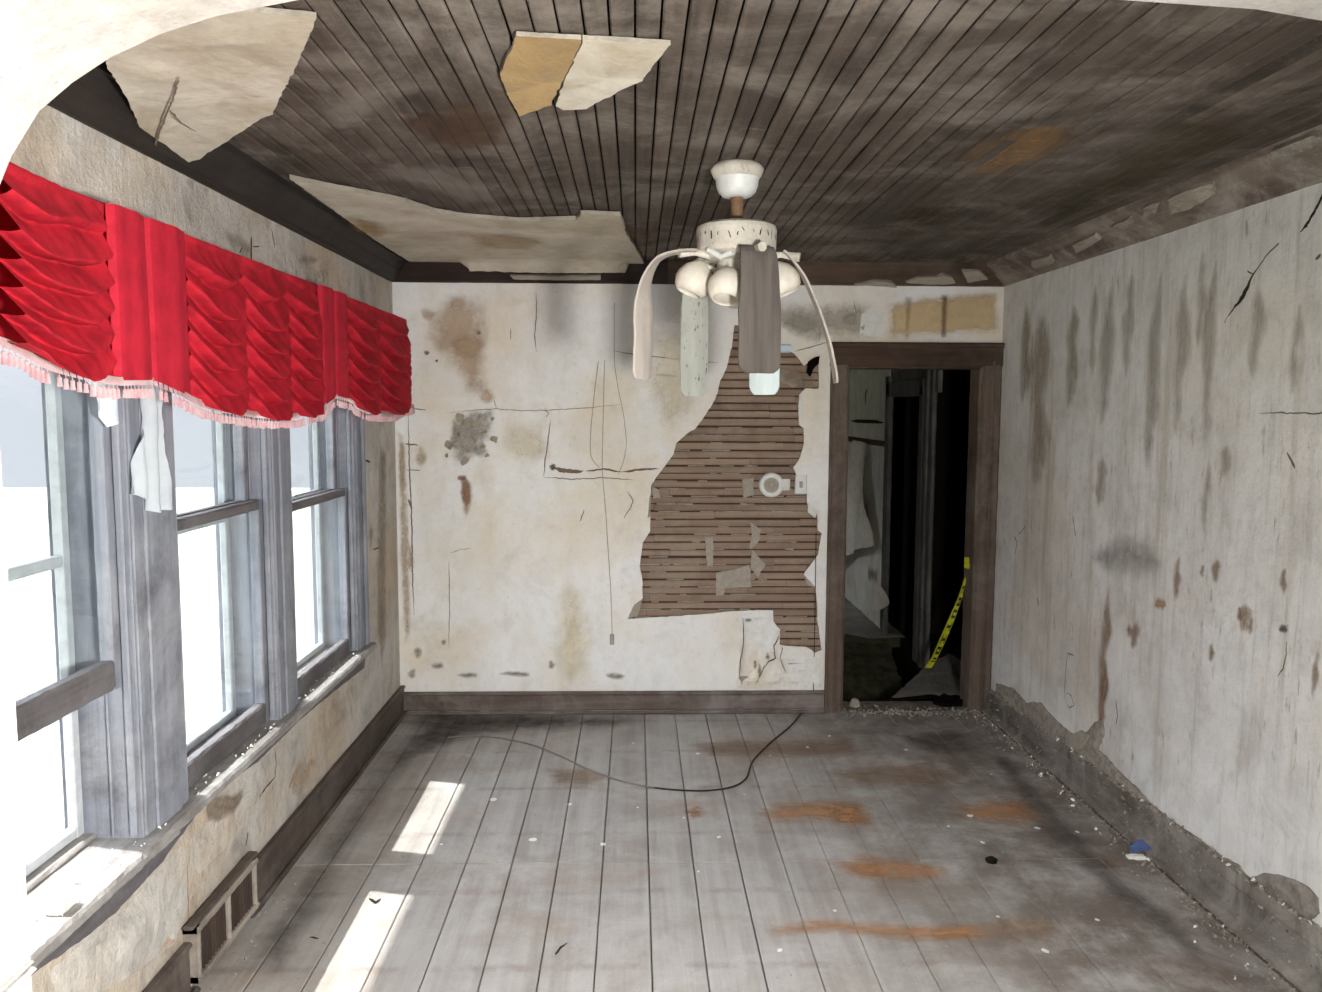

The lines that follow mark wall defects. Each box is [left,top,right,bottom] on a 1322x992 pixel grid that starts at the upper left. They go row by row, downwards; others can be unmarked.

crack [154,77,196,147]
crack [1224,195,1322,323]
peeling [444,413,498,466]
flaking render [544,325,821,651]
crack [1258,409,1322,417]
leakage [1099,608,1110,720]
flaking render [995,683,1154,806]
flaking render [1214,851,1320,920]